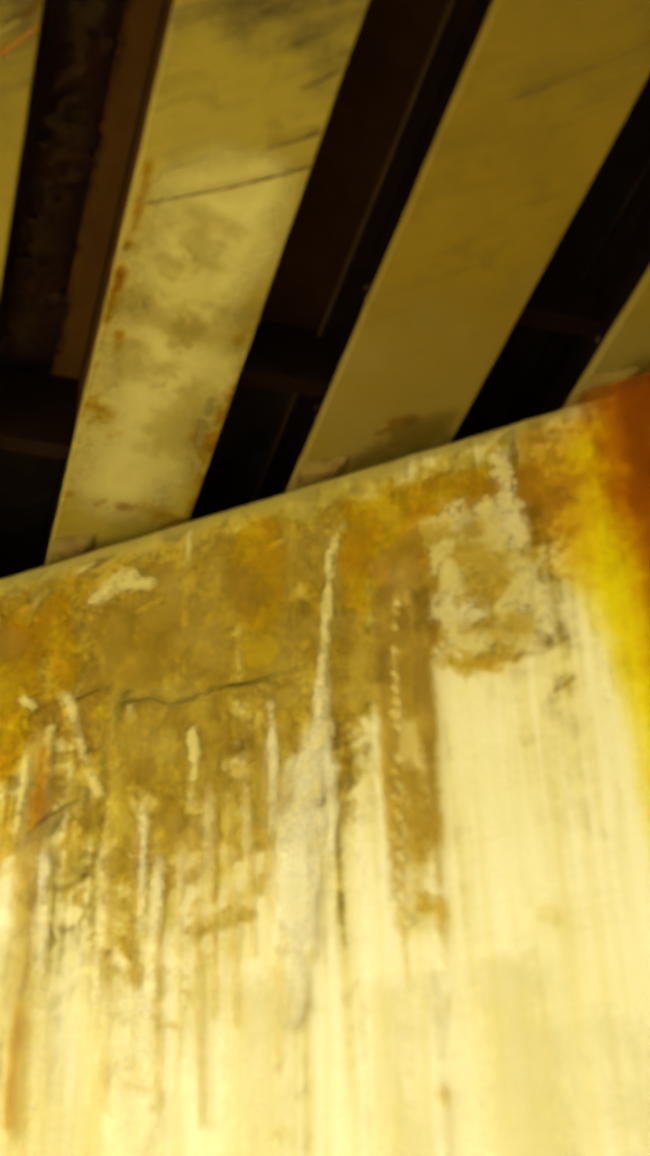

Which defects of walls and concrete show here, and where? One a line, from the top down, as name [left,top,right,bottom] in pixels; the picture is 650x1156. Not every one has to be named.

peeling [419,427,555,656]
damp [268,527,342,839]
damp [389,671,402,731]
damp [34,906,46,972]
damp [139,865,160,952]
damp [273,851,315,1024]